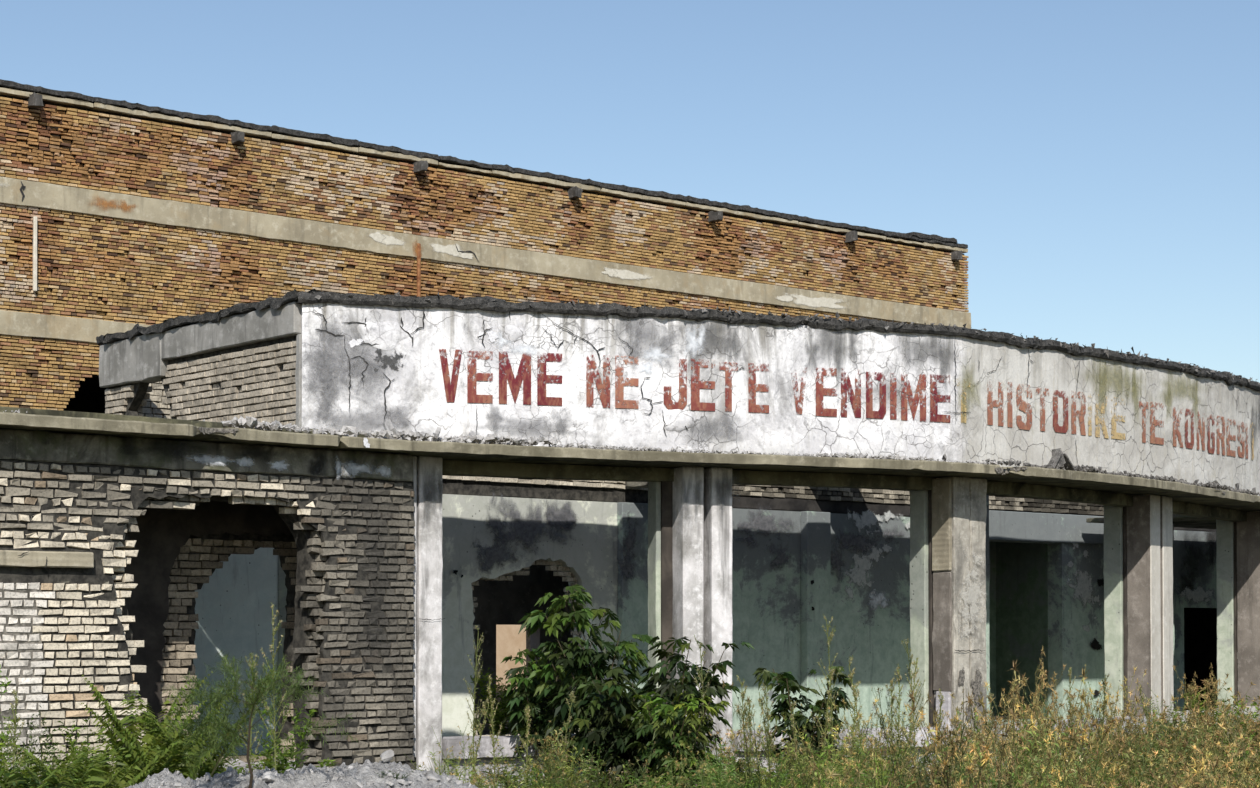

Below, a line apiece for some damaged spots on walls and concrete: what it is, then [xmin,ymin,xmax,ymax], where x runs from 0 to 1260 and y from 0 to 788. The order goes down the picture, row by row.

rust [96,198,135,211]
crack [312,310,425,420]
peeling [830,510,910,608]